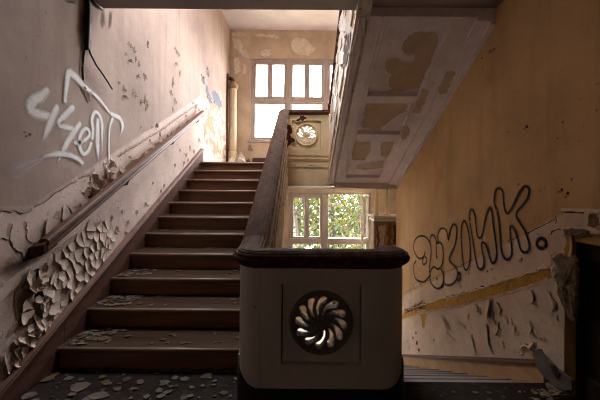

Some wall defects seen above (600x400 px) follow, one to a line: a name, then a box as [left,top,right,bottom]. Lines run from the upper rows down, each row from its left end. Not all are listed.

crack [0,168,95,258]
peeling [44,115,189,236]
peeling [125,41,148,81]
crack [117,103,198,157]
peeling [170,47,182,113]
peeling [174,66,226,168]
peeling [290,37,316,56]
peeling [329,10,362,146]
peeling [351,125,411,170]
peeling [360,28,457,131]
peeling [3,215,130,377]
flaking render [402,211,600,354]